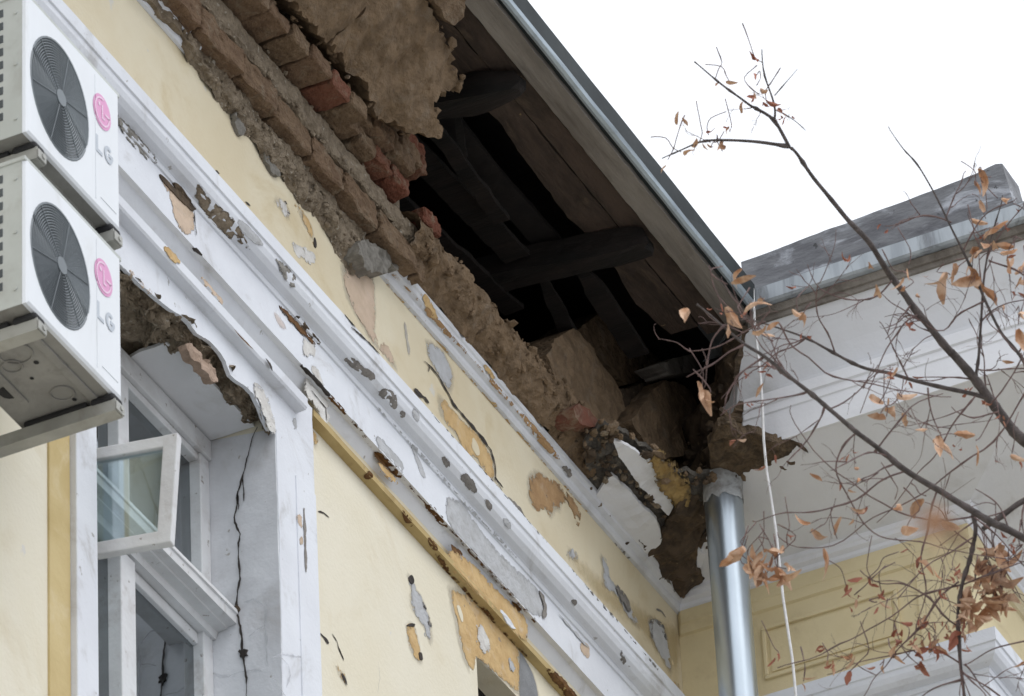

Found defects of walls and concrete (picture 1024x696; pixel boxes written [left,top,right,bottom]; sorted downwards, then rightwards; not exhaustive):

peeling [164,246,180,264]
peeling [118,112,263,250]
flaking render [261,152,281,178]
peeling [277,198,317,265]
flaking render [120,270,276,436]
crack [233,428,257,696]
peeling [275,239,588,696]
flaking render [639,449,706,598]